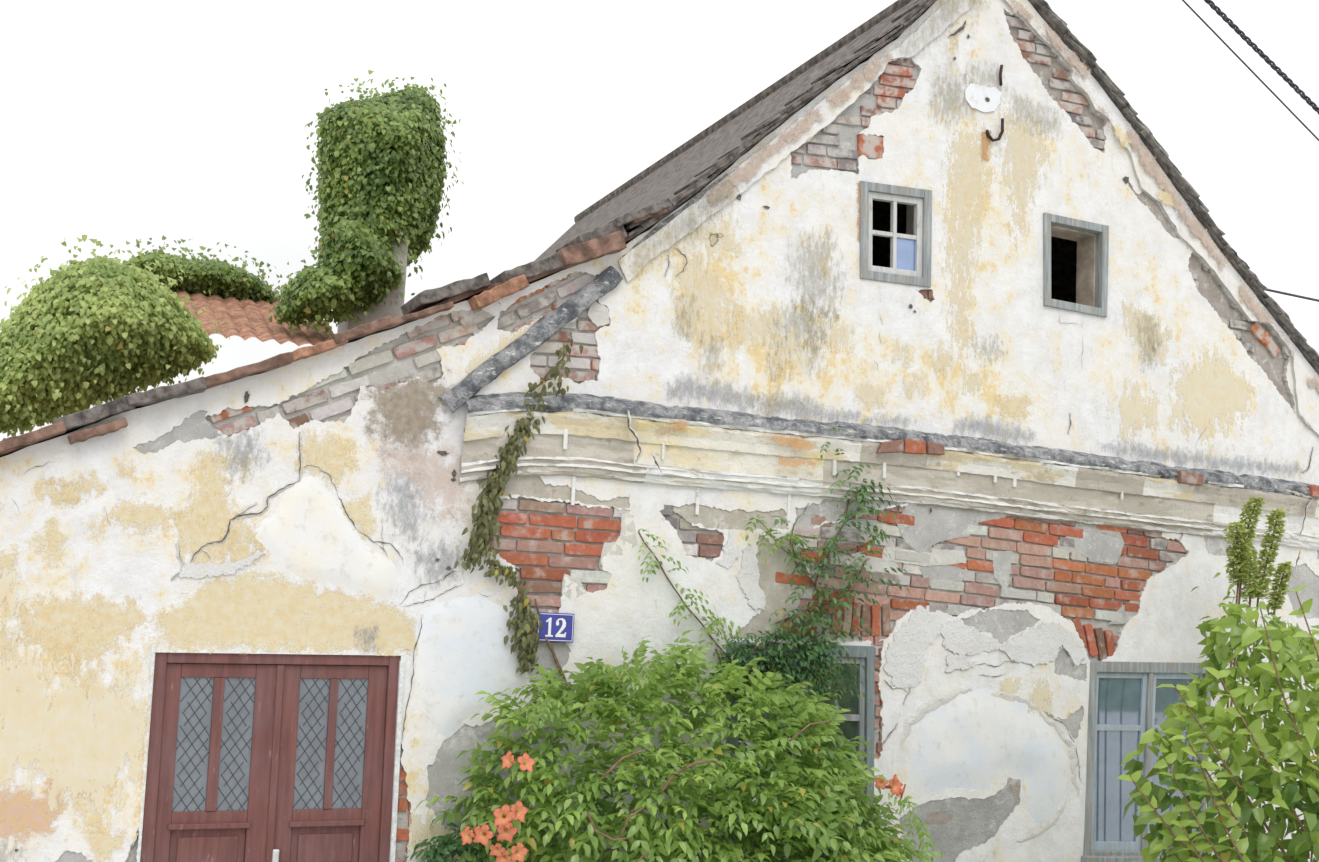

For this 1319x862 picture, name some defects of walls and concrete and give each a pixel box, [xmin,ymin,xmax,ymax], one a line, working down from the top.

spalling [790,58,919,179]
spalling [1004,0,1132,153]
peeling [1107,254,1292,446]
crack [171,432,403,581]
peeling [0,265,610,862]
water stain [366,370,469,521]
crack [400,571,485,740]
spalling [477,476,637,685]
spalling [659,498,1188,759]
peeling [899,777,1021,862]